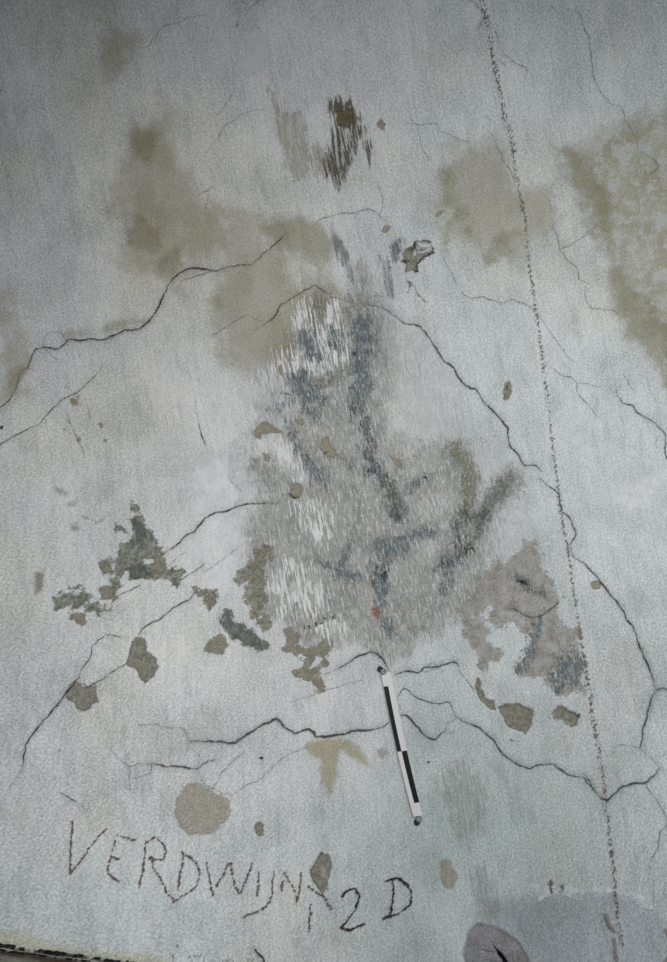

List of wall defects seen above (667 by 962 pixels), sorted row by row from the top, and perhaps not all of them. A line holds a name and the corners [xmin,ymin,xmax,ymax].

leakage [267,85,386,191]
leakage [573,115,667,339]
crack [0,238,281,407]
crack [0,377,94,445]
leakage [225,224,537,663]
flaking render [67,681,99,711]
peeling [53,500,186,626]
flaking render [127,637,159,683]
peeling [193,542,333,693]
crack [130,285,667,858]
peeling [455,539,588,741]
peeling [175,783,231,834]